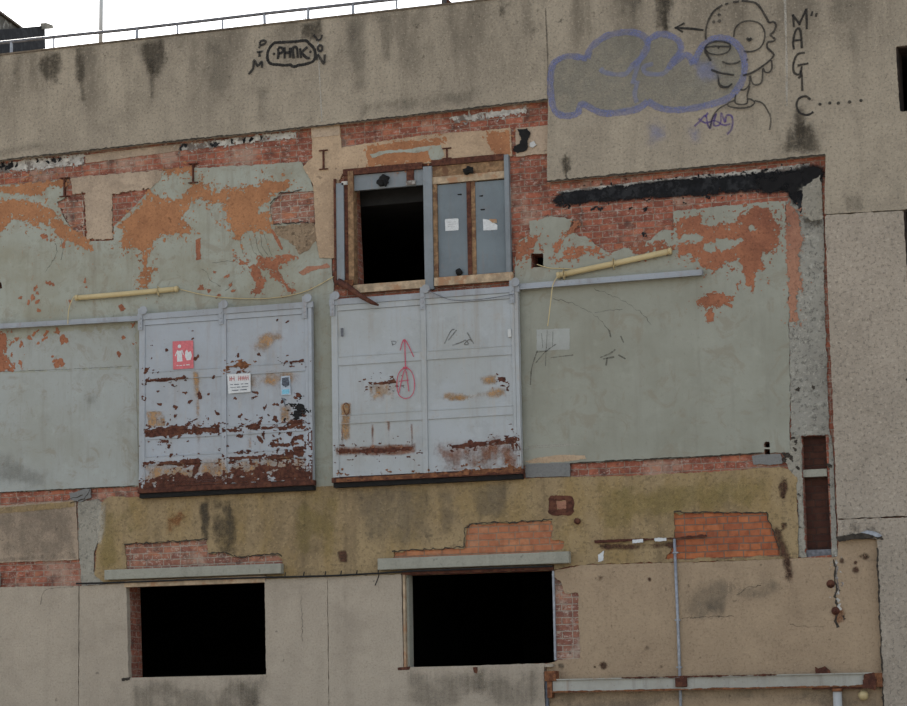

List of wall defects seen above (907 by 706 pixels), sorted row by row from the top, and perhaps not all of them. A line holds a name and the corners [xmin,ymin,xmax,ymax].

damp [40,53,60,78]
damp [143,43,163,73]
peeling [0,168,94,254]
peeling [109,159,330,299]
peeling [515,175,825,327]
corrosion [212,335,277,400]
corrosion [359,372,404,395]
corrosion [138,355,313,493]
corrosion [333,404,521,482]
damp [200,503,236,551]
flaking render [654,512,780,560]
crack [833,559,846,628]